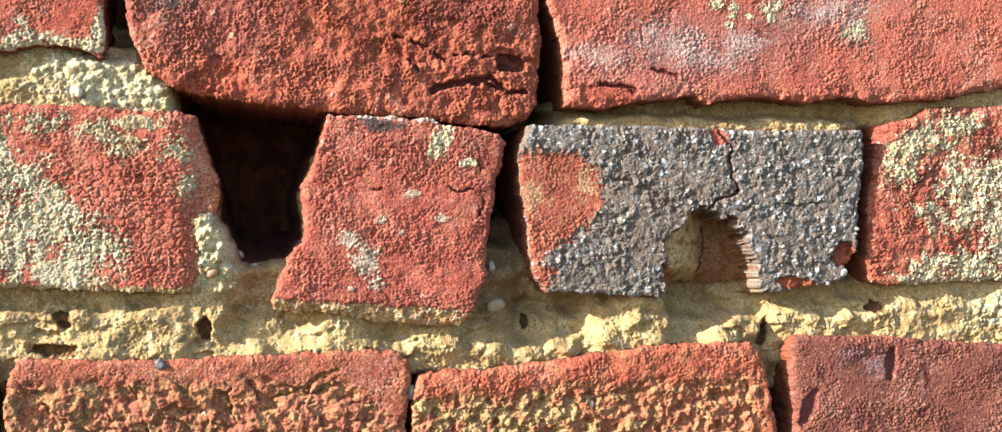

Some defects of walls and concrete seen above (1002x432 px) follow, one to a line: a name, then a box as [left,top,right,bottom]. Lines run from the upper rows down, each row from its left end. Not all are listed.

damp [563,0,882,76]
spalling [663,210,753,285]
spalling [3,372,768,432]